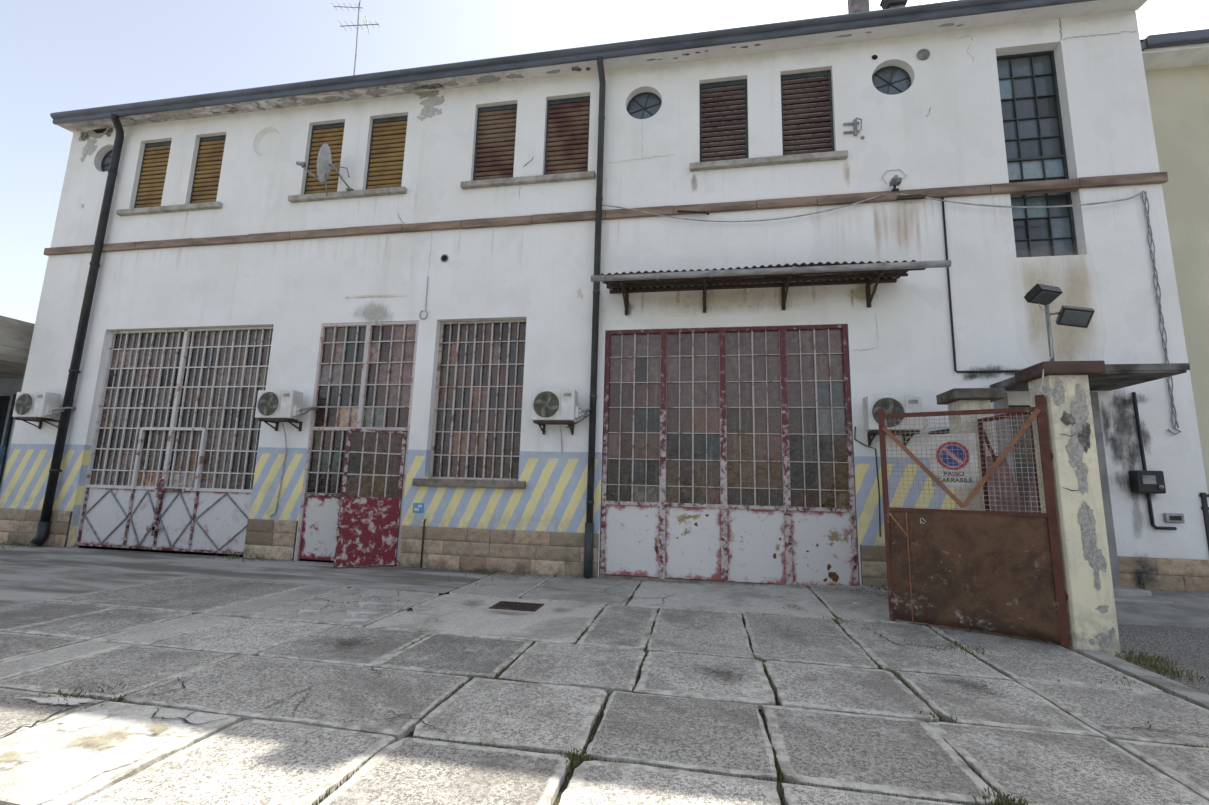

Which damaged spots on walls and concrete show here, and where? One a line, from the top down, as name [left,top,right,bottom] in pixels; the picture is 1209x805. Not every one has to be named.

flaking render [403,81,458,121]
flaking render [79,128,113,162]
leakage [1102,398,1149,530]
peeling [1052,378,1109,613]
crack [0,677,313,736]